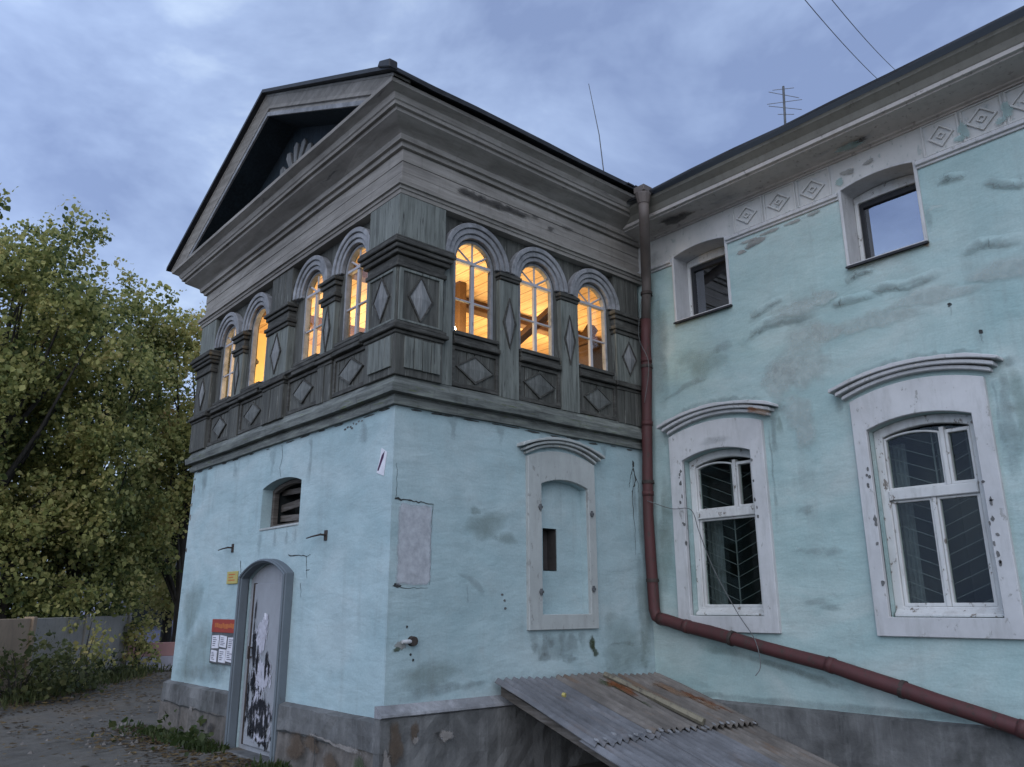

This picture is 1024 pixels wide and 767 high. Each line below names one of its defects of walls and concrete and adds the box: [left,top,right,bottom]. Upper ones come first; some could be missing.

crack [629,460,639,554]
peeling [988,496,1002,566]
spalling [244,602,363,767]